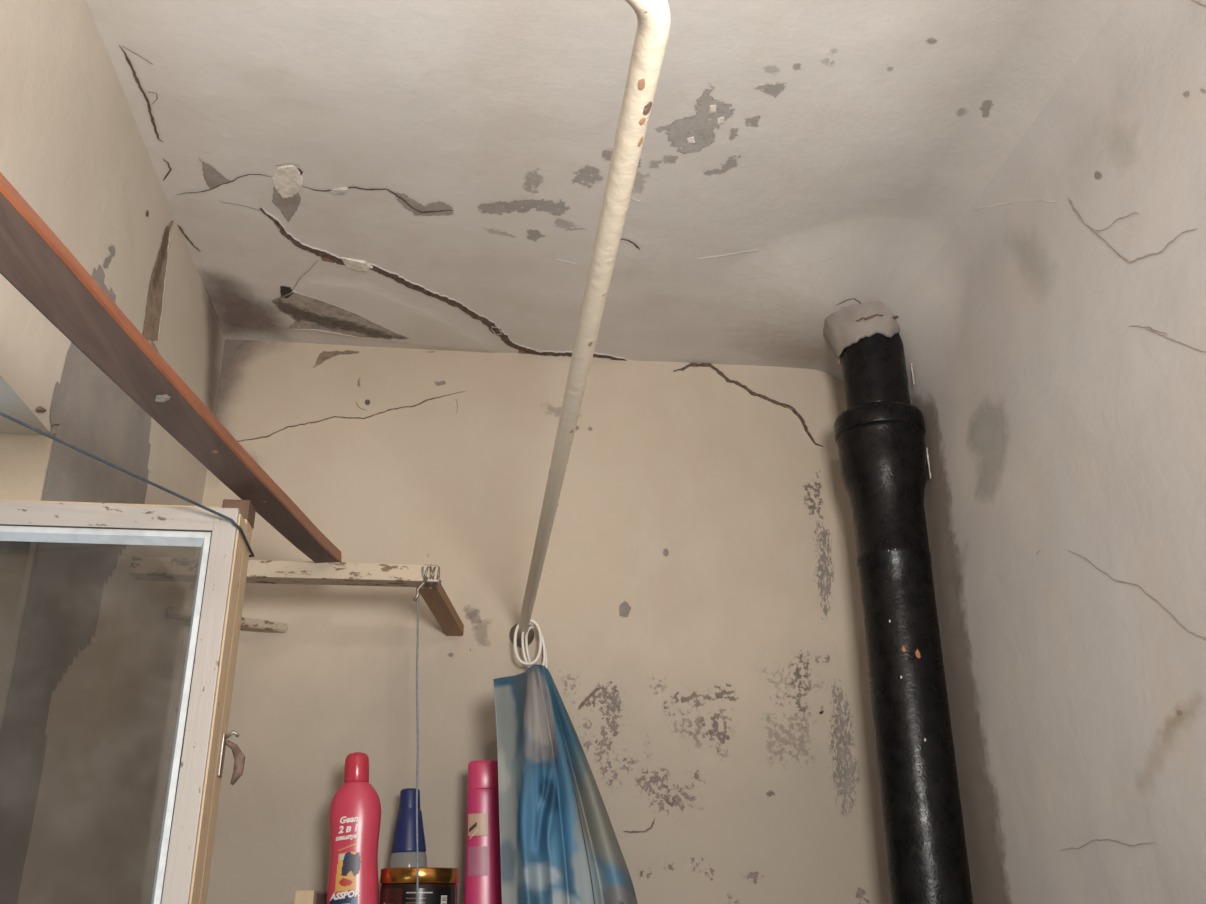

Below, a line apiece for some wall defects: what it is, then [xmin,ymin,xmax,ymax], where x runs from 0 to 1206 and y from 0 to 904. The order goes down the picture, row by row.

peeling [657,86,760,163]
crack [119,45,630,361]
crack [974,198,1196,263]
flaking render [143,220,201,353]
flaking render [272,286,492,366]
crack [1132,325,1206,352]
flaking render [36,343,151,504]
crack [237,391,466,443]
crack [673,363,823,448]
crack [1070,551,1206,639]
flaking render [0,542,126,904]
peeling [578,682,672,833]